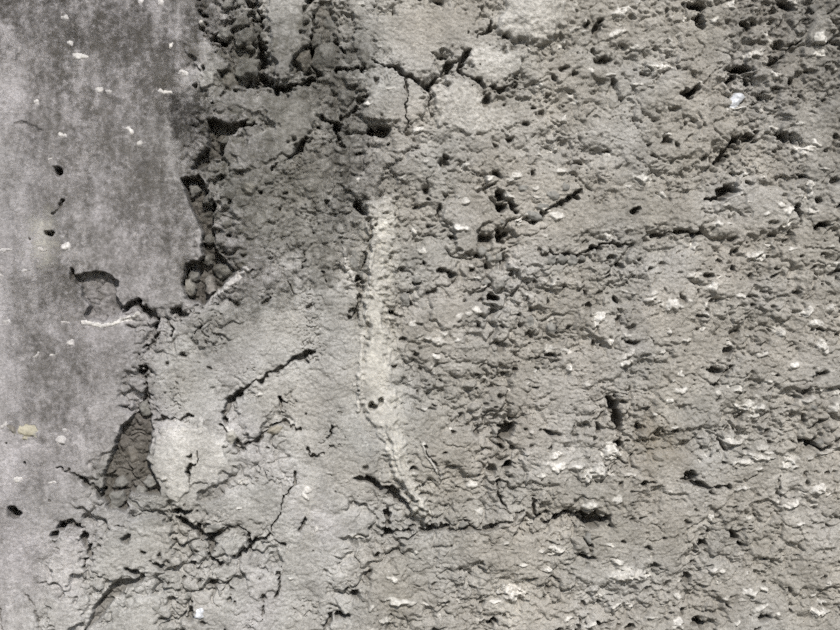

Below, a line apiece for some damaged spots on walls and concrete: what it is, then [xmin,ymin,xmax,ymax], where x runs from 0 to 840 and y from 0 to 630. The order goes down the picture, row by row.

damp [51,0,151,95]
damp [184,0,209,32]
spalling [206,12,261,104]
crack [230,0,518,128]
spalling [75,271,142,328]
damp [47,88,192,310]
spalling [181,108,266,306]
crack [348,200,377,321]
spalling [359,0,840,630]
crack [64,518,94,571]
spalling [36,400,203,630]
crack [113,298,612,630]